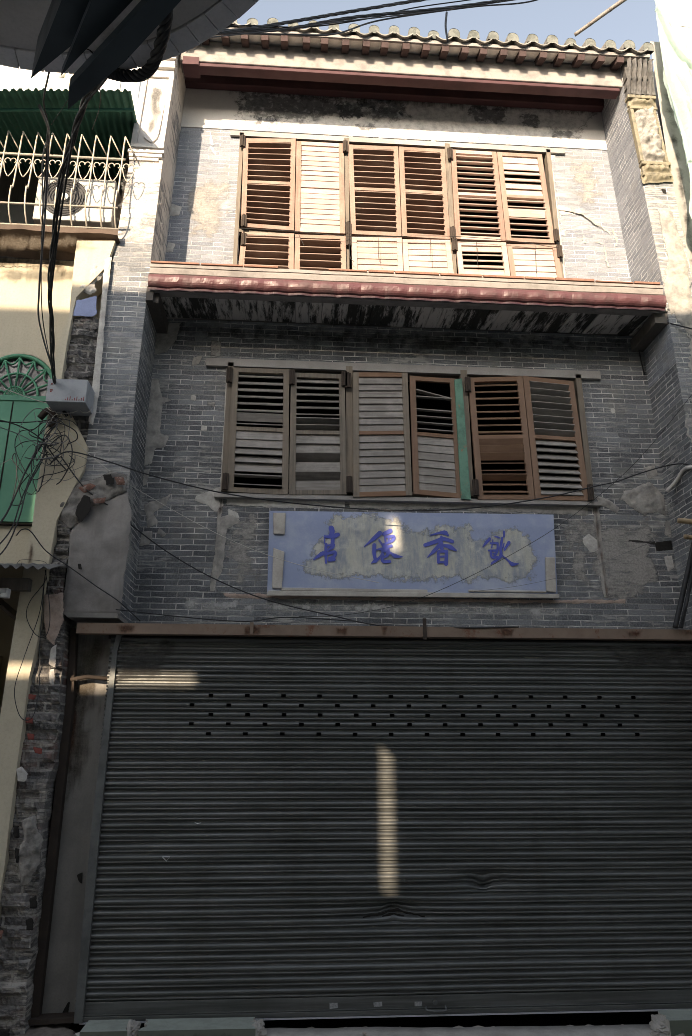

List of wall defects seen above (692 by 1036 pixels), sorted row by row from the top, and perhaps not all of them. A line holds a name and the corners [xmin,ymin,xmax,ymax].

crack [558,209,618,267]
spalling [59,471,128,528]
peeling [195,486,240,581]
spalling [595,465,674,572]